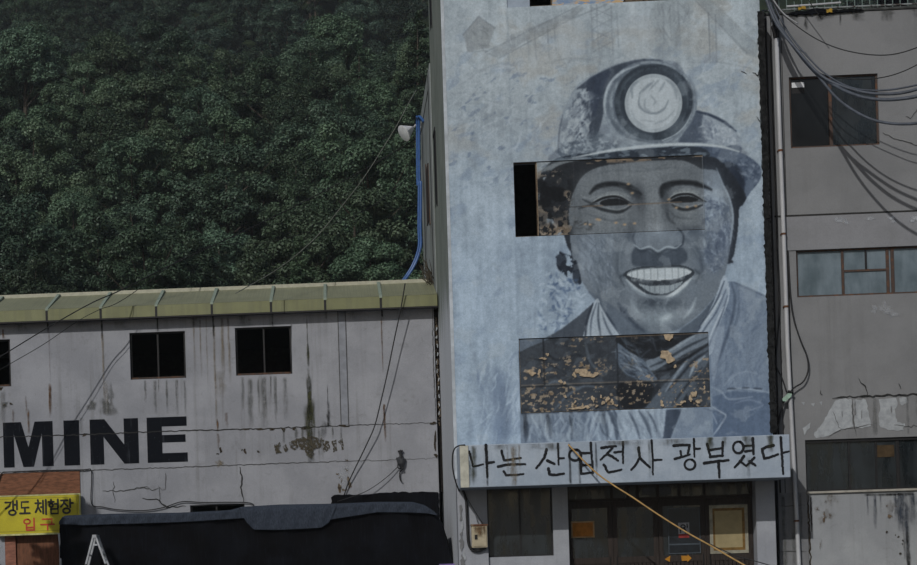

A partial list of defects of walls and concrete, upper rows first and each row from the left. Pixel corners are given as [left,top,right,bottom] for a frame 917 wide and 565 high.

damp [295,375,315,459]
peeling [802,397,908,438]
crack [820,379,917,436]
crack [0,458,422,509]
peeling [242,427,352,493]
damp [865,493,915,565]